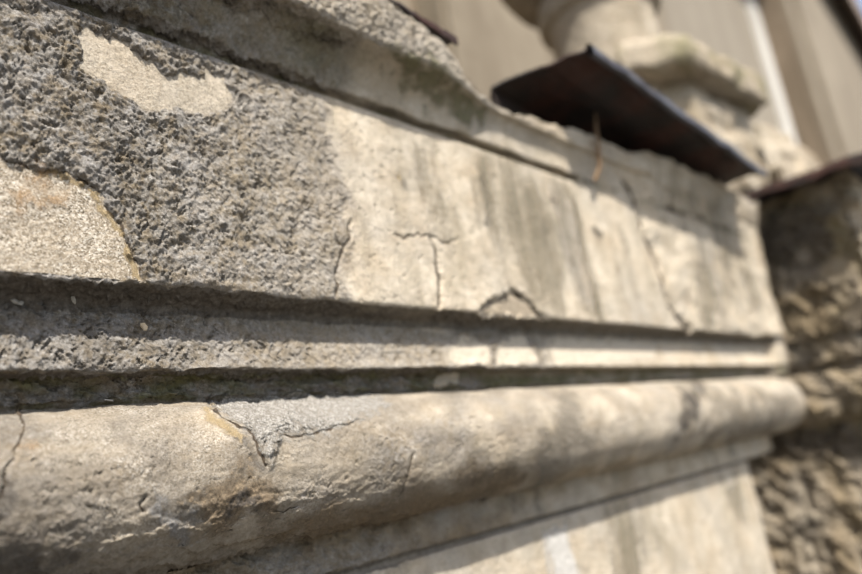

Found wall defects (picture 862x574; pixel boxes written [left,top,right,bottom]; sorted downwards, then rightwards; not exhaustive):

spalling [77,26,232,115]
spalling [0,157,142,282]
crack [395,233,452,309]
crack [582,178,690,335]
crack [665,205,741,234]
crack [0,408,25,498]
crack [280,422,353,438]